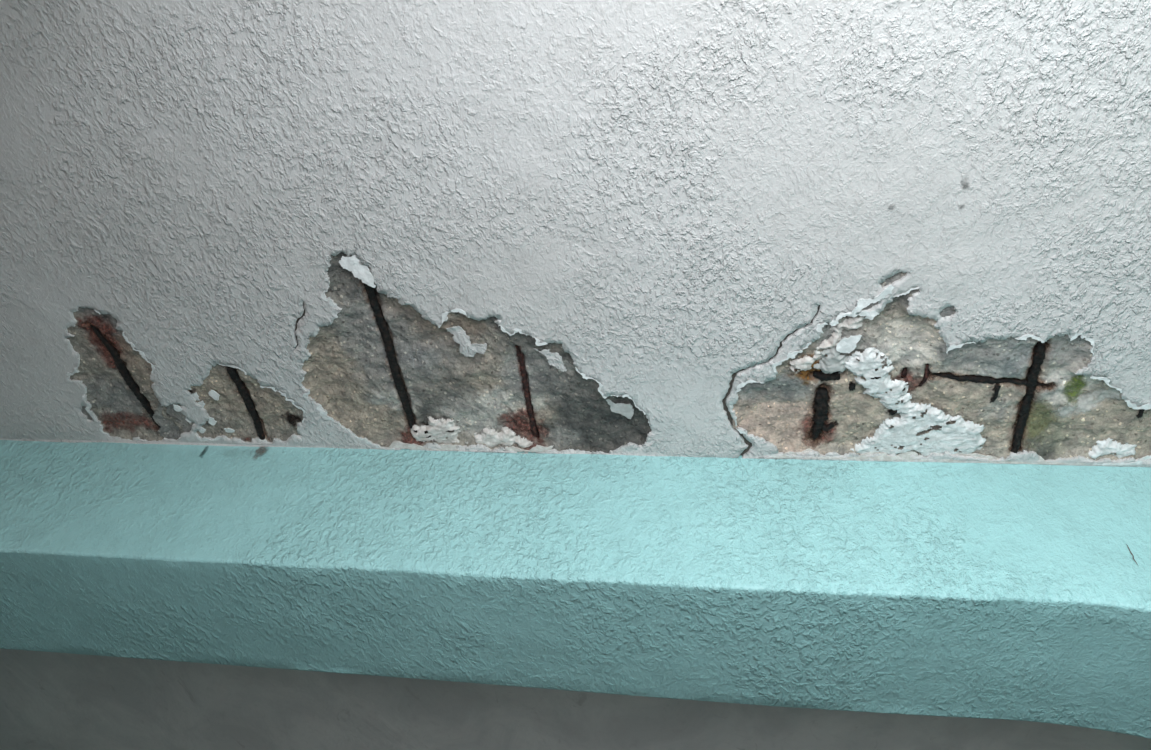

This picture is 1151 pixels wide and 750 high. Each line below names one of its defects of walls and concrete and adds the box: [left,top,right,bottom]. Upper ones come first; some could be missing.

spalling [66,252,652,453]
crack [722,305,820,456]
spalling [731,272,1151,466]